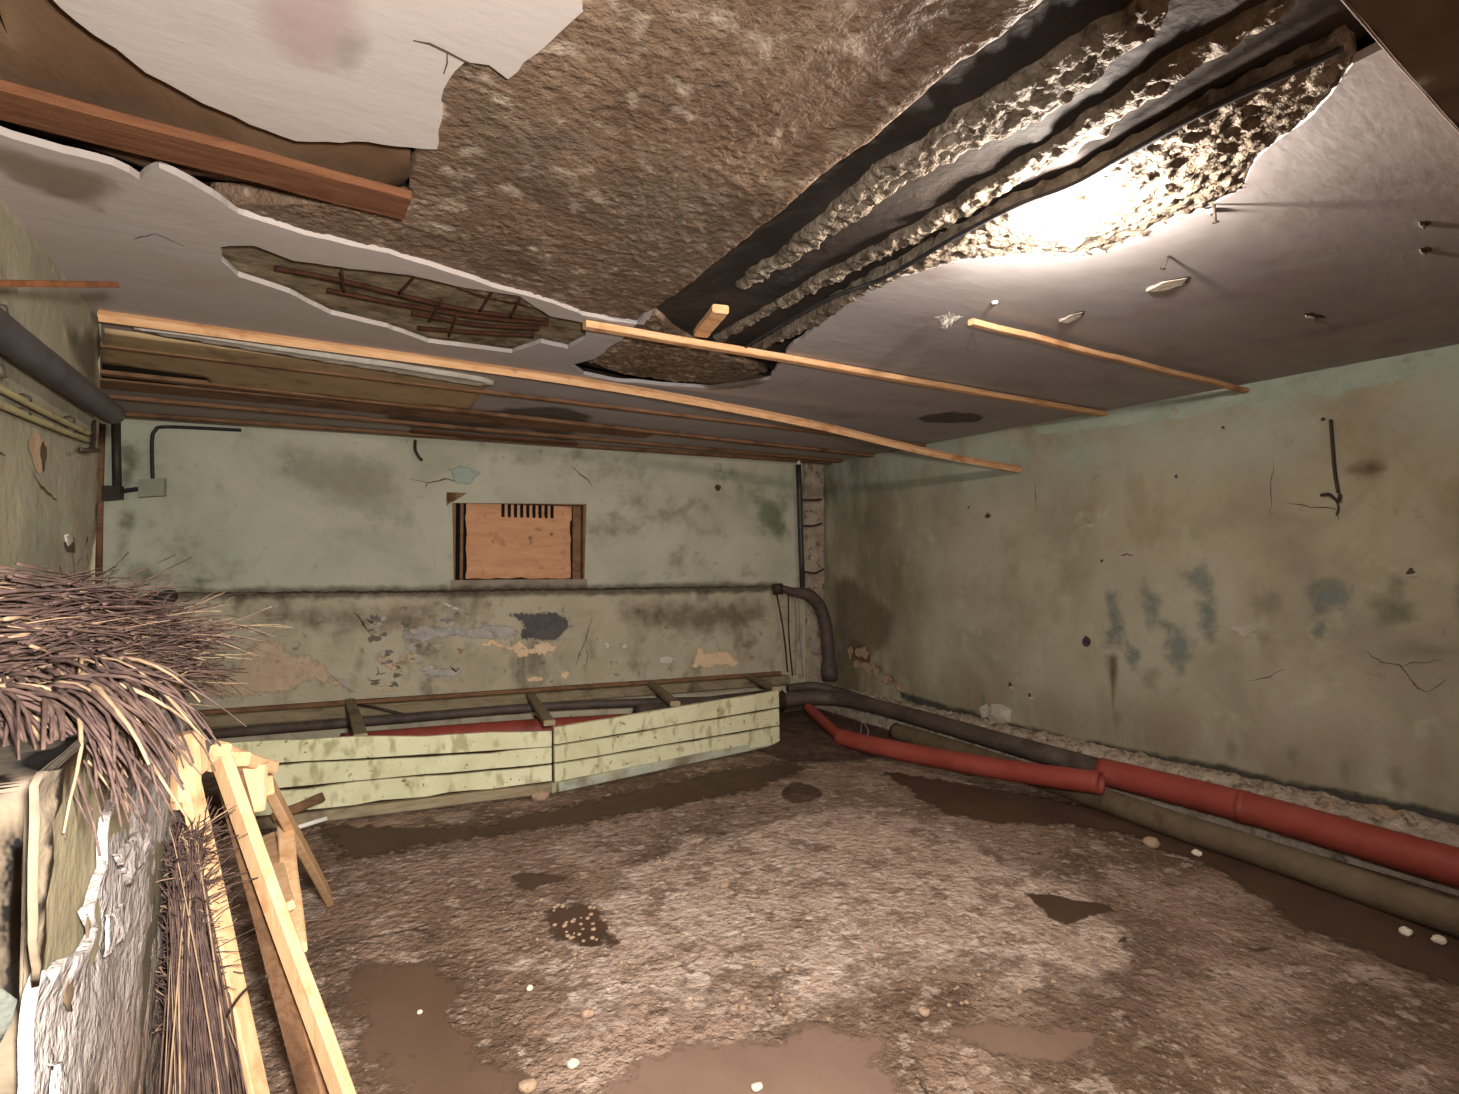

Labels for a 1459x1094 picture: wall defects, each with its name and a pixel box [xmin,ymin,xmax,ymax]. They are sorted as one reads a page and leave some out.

peeling [1145,276,1190,292]
spalling [222,246,585,349]
peeling [1058,311,1085,324]
peeling [690,644,740,668]
crack [1359,648,1446,699]